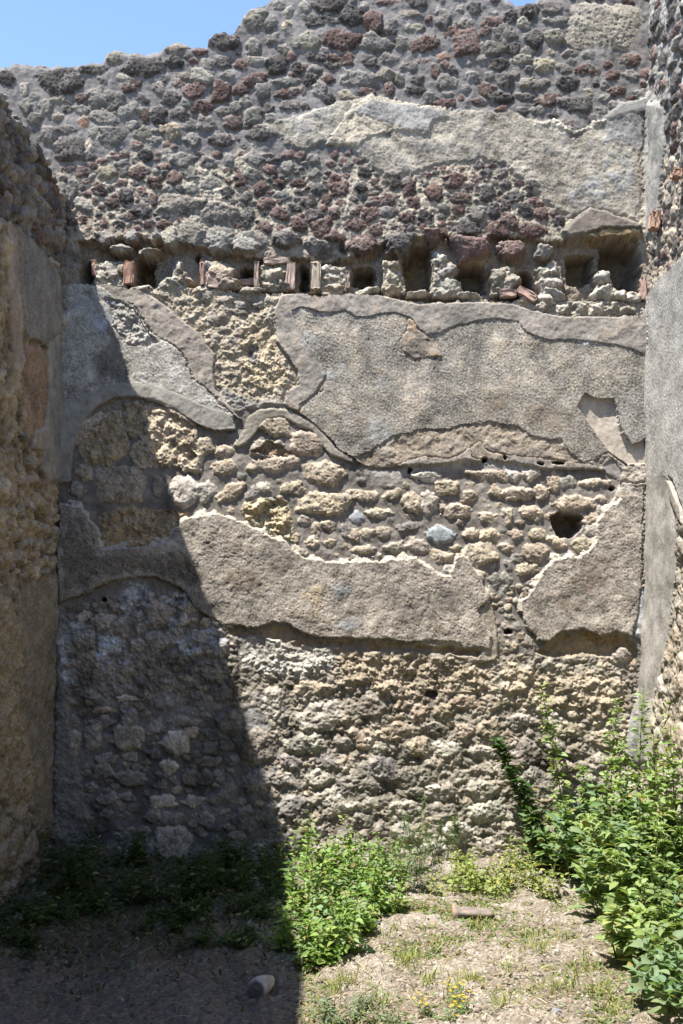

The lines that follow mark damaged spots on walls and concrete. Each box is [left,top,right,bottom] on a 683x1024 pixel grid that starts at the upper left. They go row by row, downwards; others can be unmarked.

spalling [62,139,564,254]
crack [397,314,445,363]
spalling [50,288,645,861]